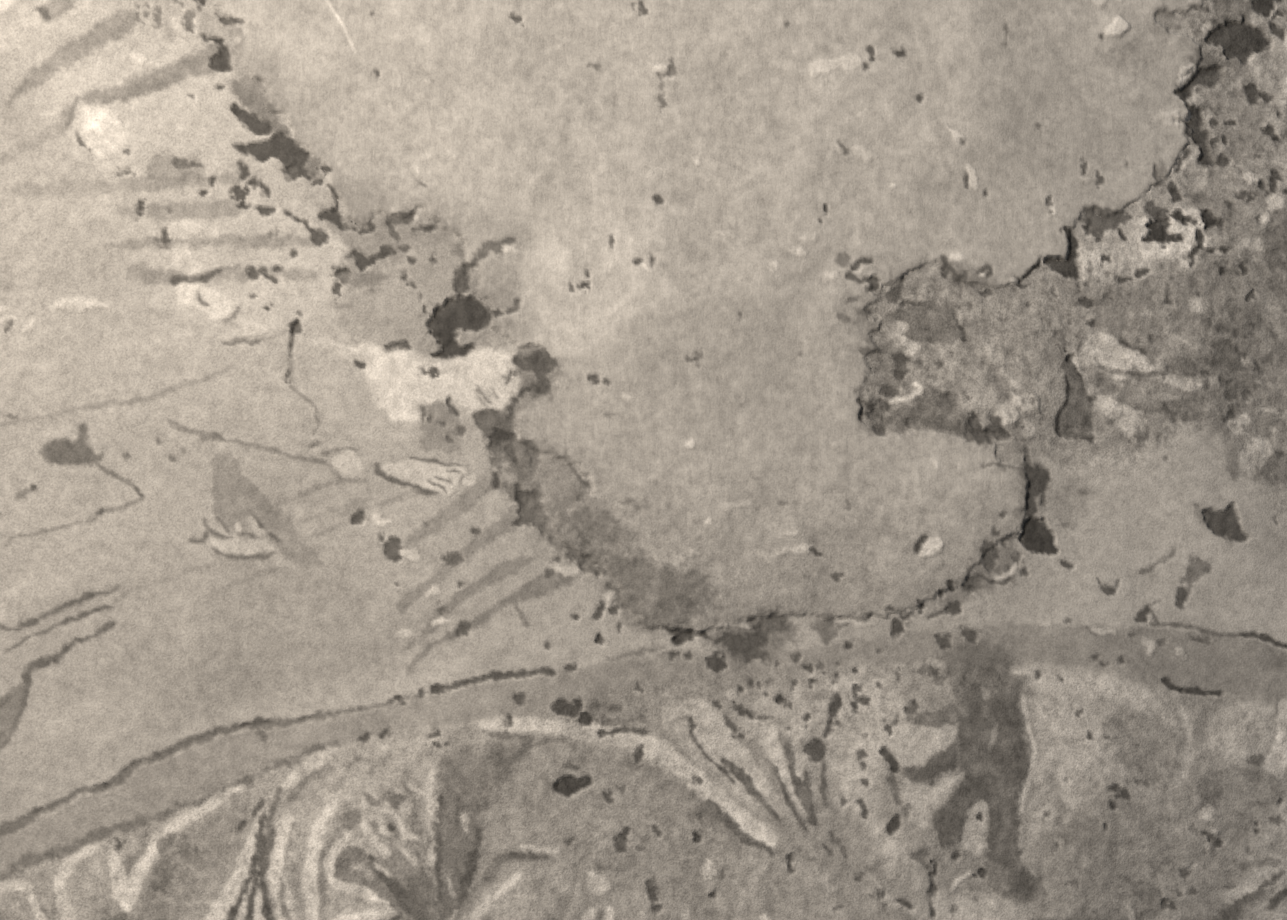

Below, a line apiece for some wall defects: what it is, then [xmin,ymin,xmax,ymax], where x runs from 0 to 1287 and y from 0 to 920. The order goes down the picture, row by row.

hole [627,0,651,17]
spalling [652,192,666,207]
flaking render [72,0,565,524]
hole [567,268,593,299]
hole [587,372,635,422]
flaking render [707,0,1287,825]
peeling [348,508,423,588]
peeling [391,551,473,640]
flaking render [570,596,625,646]
crack [1149,612,1287,674]
crack [1161,676,1226,700]
hole [1103,777,1160,834]